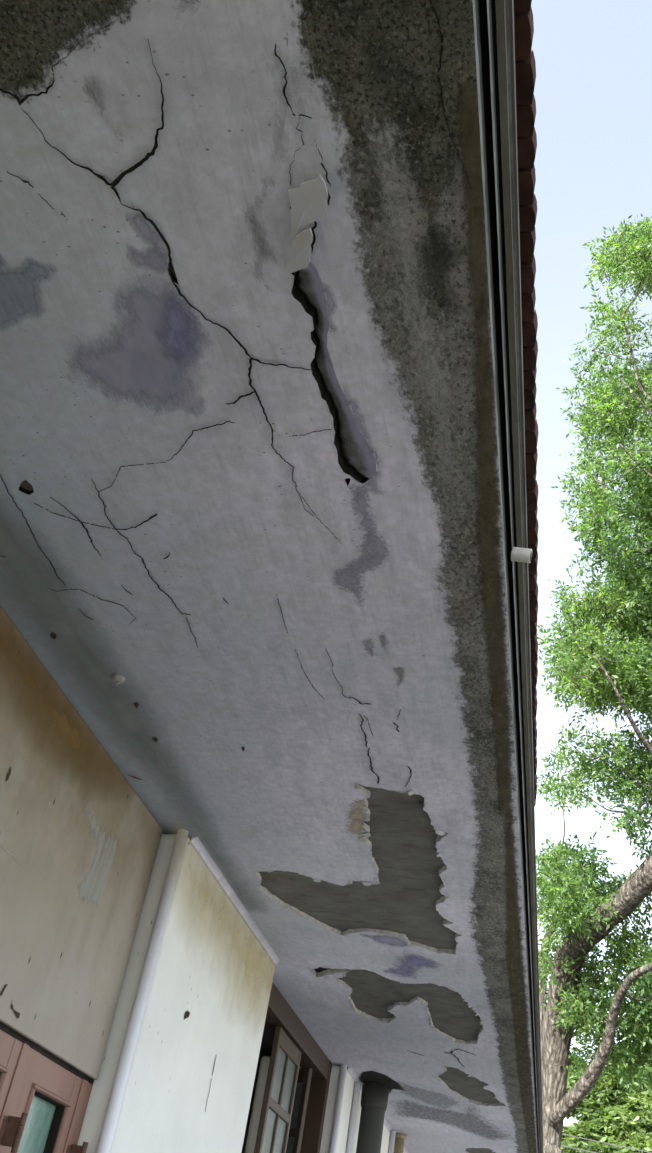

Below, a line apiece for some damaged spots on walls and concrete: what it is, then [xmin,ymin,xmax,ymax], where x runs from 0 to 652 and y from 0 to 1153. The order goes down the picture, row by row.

damp [0,0,136,99]
crack [0,18,342,648]
damp [0,517,178,786]
damp [283,0,537,1153]
spalling [255,783,463,955]
spalling [332,969,484,1044]
spalling [436,1065,506,1107]